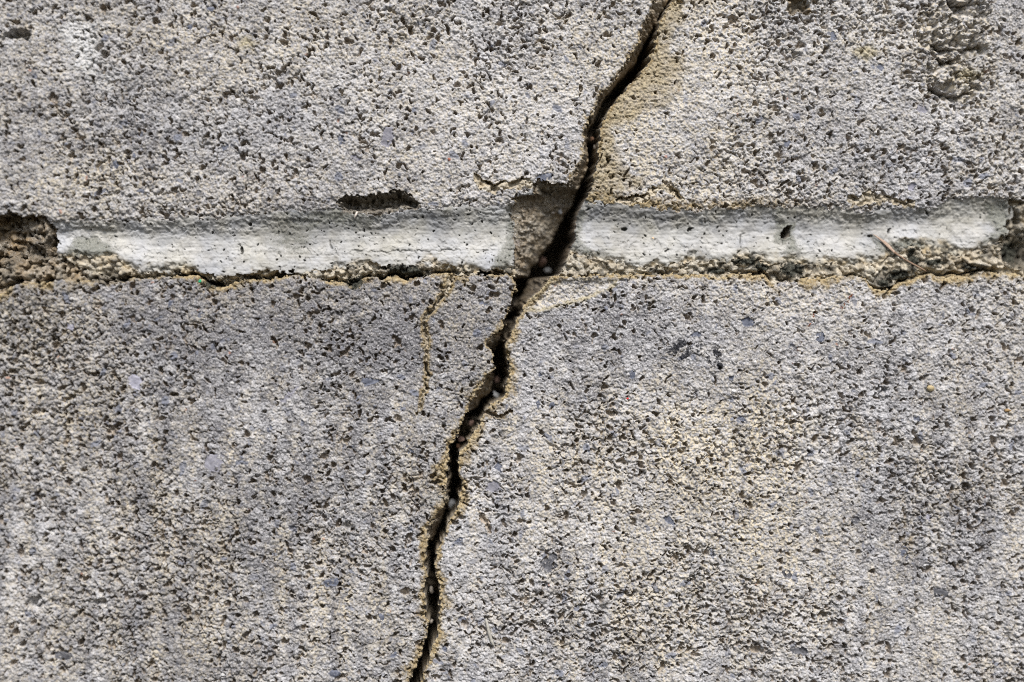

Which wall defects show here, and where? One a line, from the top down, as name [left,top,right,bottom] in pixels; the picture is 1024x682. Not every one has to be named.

spalling [335,188,421,217]
crack [613,183,686,206]
spalling [0,209,125,294]
crack [558,241,1024,291]
crack [67,0,672,682]